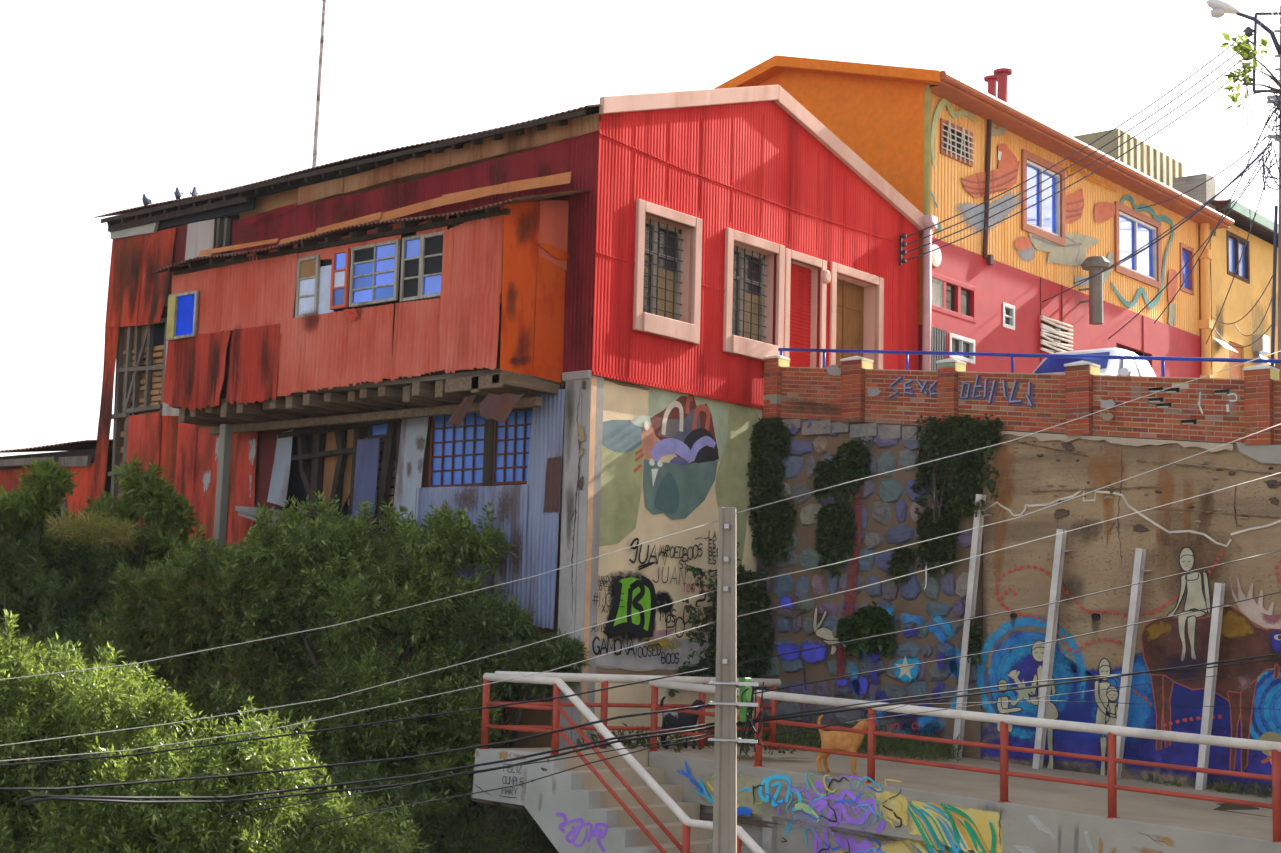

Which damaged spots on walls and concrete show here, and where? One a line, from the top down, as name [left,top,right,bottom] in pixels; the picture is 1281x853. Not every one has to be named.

leakage [1165,532,1226,600]